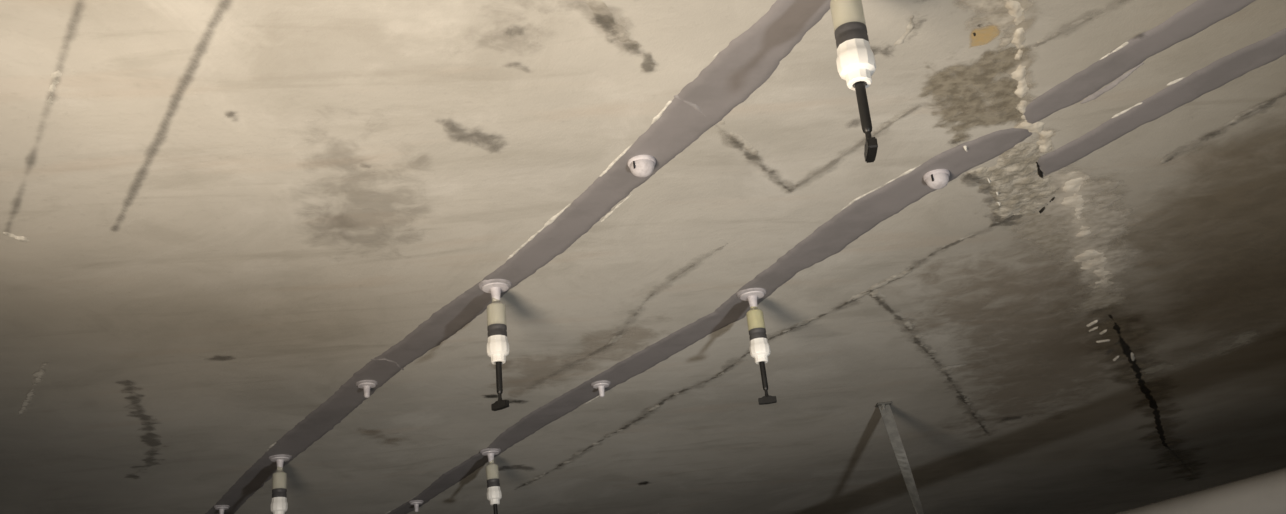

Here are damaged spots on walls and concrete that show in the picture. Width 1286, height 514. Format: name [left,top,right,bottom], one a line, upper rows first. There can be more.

water stain [446,123,496,148]
rust [971,24,999,46]
water stain [923,0,1056,153]
water stain [1014,171,1130,311]
crack [1086,306,1200,480]